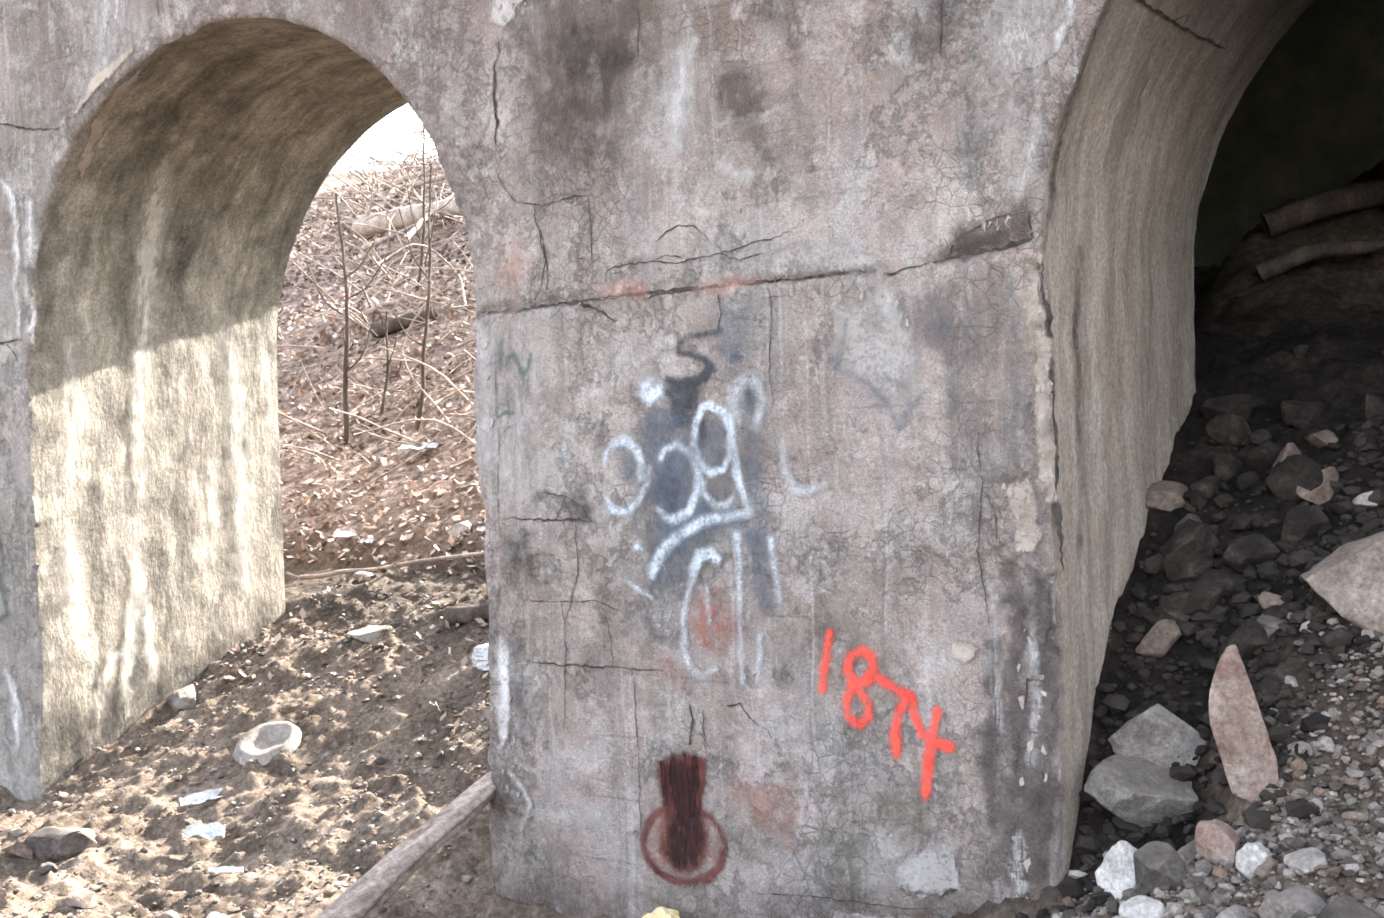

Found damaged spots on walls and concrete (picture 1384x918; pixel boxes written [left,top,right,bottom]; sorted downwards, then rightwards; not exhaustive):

peeling [491,0,527,26]
crack [1138,0,1226,49]
crack [0,123,61,131]
damp [520,0,649,159]
damp [671,57,689,149]
damp [716,71,762,143]
crack [483,37,1064,711]
spalling [944,205,1064,900]
crack [495,353,664,851]
crack [689,702,772,753]